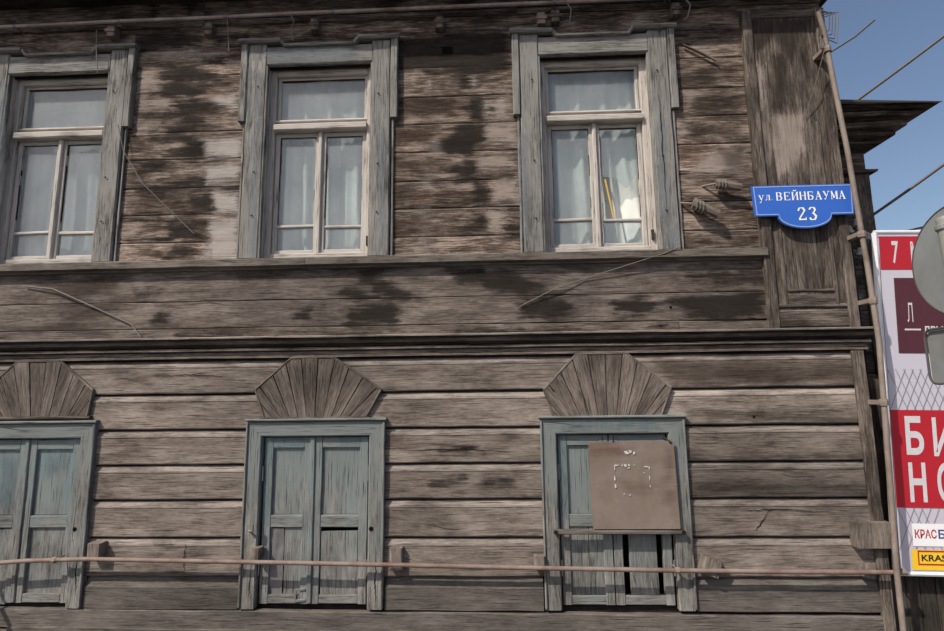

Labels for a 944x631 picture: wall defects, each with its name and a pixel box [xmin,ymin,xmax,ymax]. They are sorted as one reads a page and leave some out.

leakage [135,34,197,53]
leakage [394,26,512,202]
leakage [120,57,224,260]
leakage [454,218,488,237]
leakage [149,310,168,323]
leakage [264,268,424,343]
leakage [446,267,581,333]